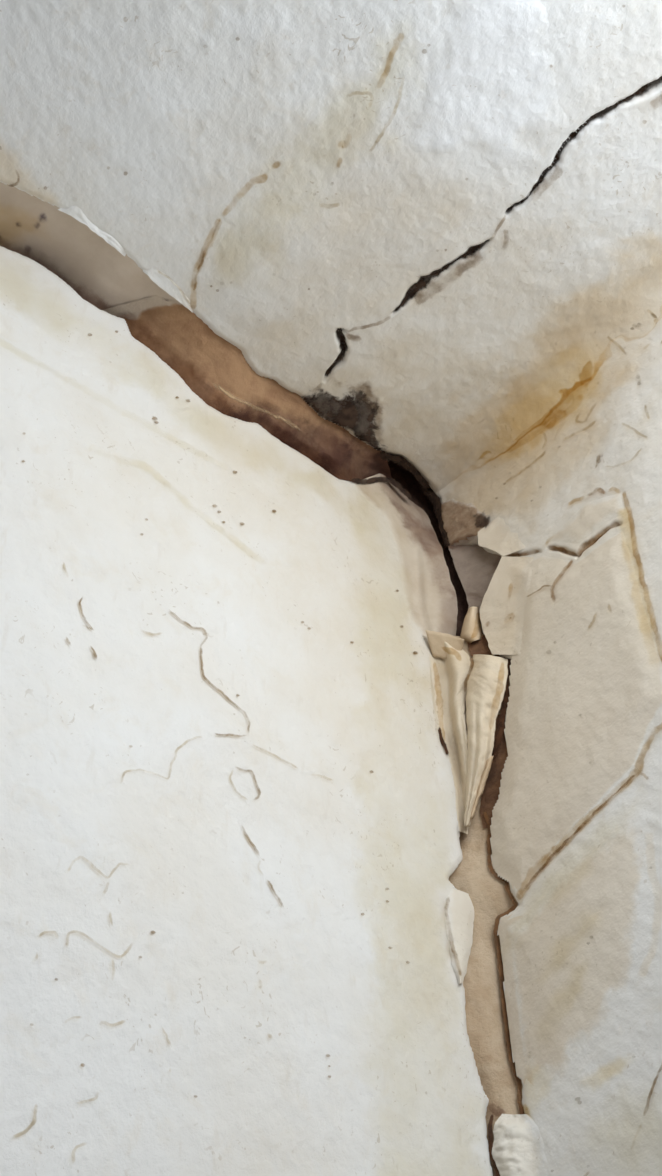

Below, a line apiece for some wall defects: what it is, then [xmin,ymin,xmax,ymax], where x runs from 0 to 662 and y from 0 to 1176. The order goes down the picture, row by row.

crack [506,76,662,213]
crack [393,240,489,312]
spalling [0,182,393,483]
crack [325,328,348,376]
damp [301,389,382,451]
crack [509,530,606,597]
crack [492,654,511,759]
spalling [424,499,547,1176]
crack [483,811,525,1176]